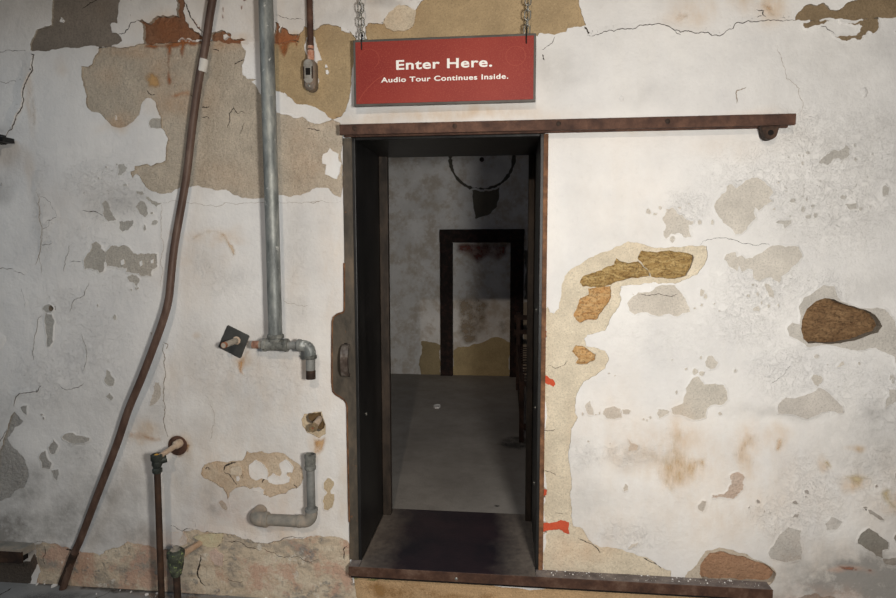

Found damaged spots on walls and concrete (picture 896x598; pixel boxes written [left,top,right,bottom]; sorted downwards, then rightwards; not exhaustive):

crack [587,9,795,36]
peeling [790,0,896,44]
crack [0,50,34,135]
peeling [27,0,264,233]
peeling [274,0,590,201]
peeling [82,241,159,291]
peeling [453,335,510,376]
peeling [543,176,818,588]
spalling [775,283,896,421]
peeling [0,403,92,505]
peeling [198,448,306,514]
peeling [0,528,699,598]